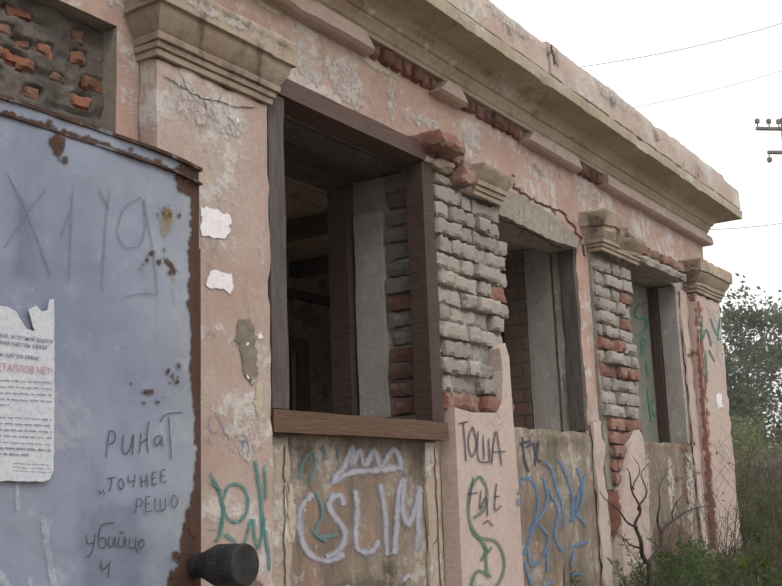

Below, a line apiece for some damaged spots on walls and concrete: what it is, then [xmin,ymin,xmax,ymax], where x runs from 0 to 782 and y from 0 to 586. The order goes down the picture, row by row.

crack [164,70,254,118]
flaking render [324,44,435,111]
crack [502,220,562,249]
corrosion [2,110,201,586]
flaking render [224,319,264,462]